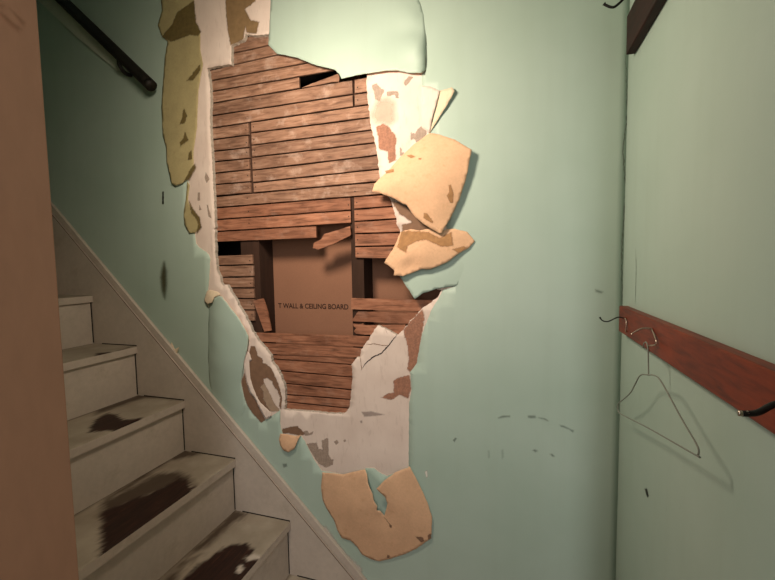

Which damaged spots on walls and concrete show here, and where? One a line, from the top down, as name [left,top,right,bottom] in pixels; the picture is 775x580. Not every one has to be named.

peeling [366,71,474,276]
flaking render [158,0,455,561]
crack [360,328,396,370]